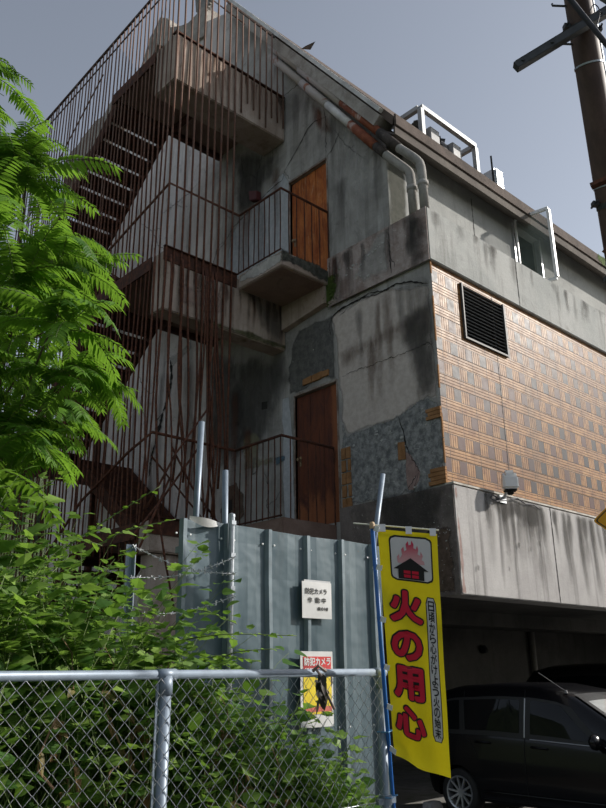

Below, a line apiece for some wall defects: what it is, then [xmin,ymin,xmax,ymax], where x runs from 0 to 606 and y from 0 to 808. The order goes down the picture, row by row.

crack [329,233,428,335]
peeling [282,286,444,519]
leakage [498,501,557,542]
leakage [569,516,596,559]